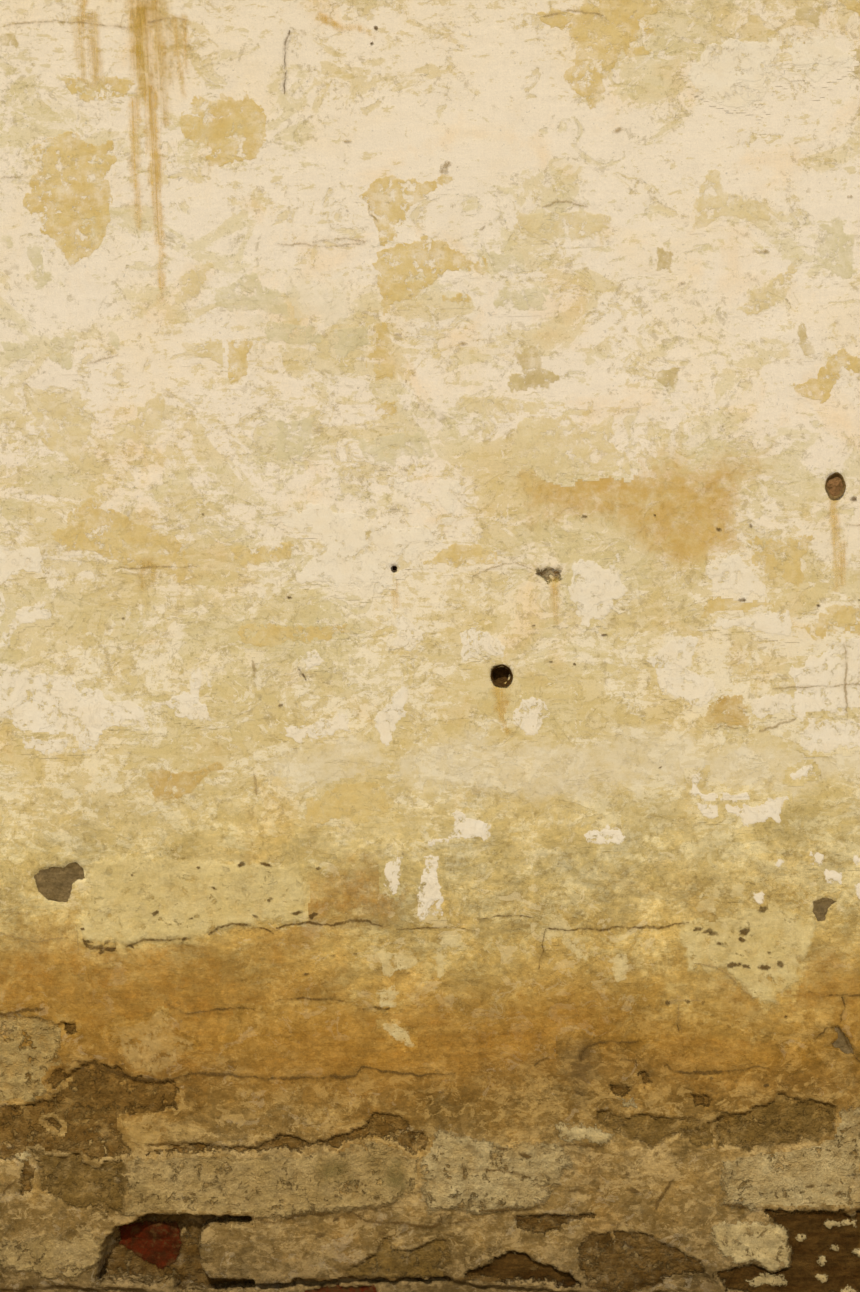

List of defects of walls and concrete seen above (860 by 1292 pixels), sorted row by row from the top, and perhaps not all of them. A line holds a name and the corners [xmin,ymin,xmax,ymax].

peeling [0,127,122,297]
peeling [167,168,620,427]
peeling [0,494,218,760]
peeling [225,470,631,659]
spalling [34,862,85,902]
crack [83,939,170,951]
damp [0,849,860,1122]
crack [208,915,689,967]
peeling [231,524,860,1054]
spalling [0,1006,433,1292]
spalling [305,1191,860,1292]
spalling [555,1065,842,1157]